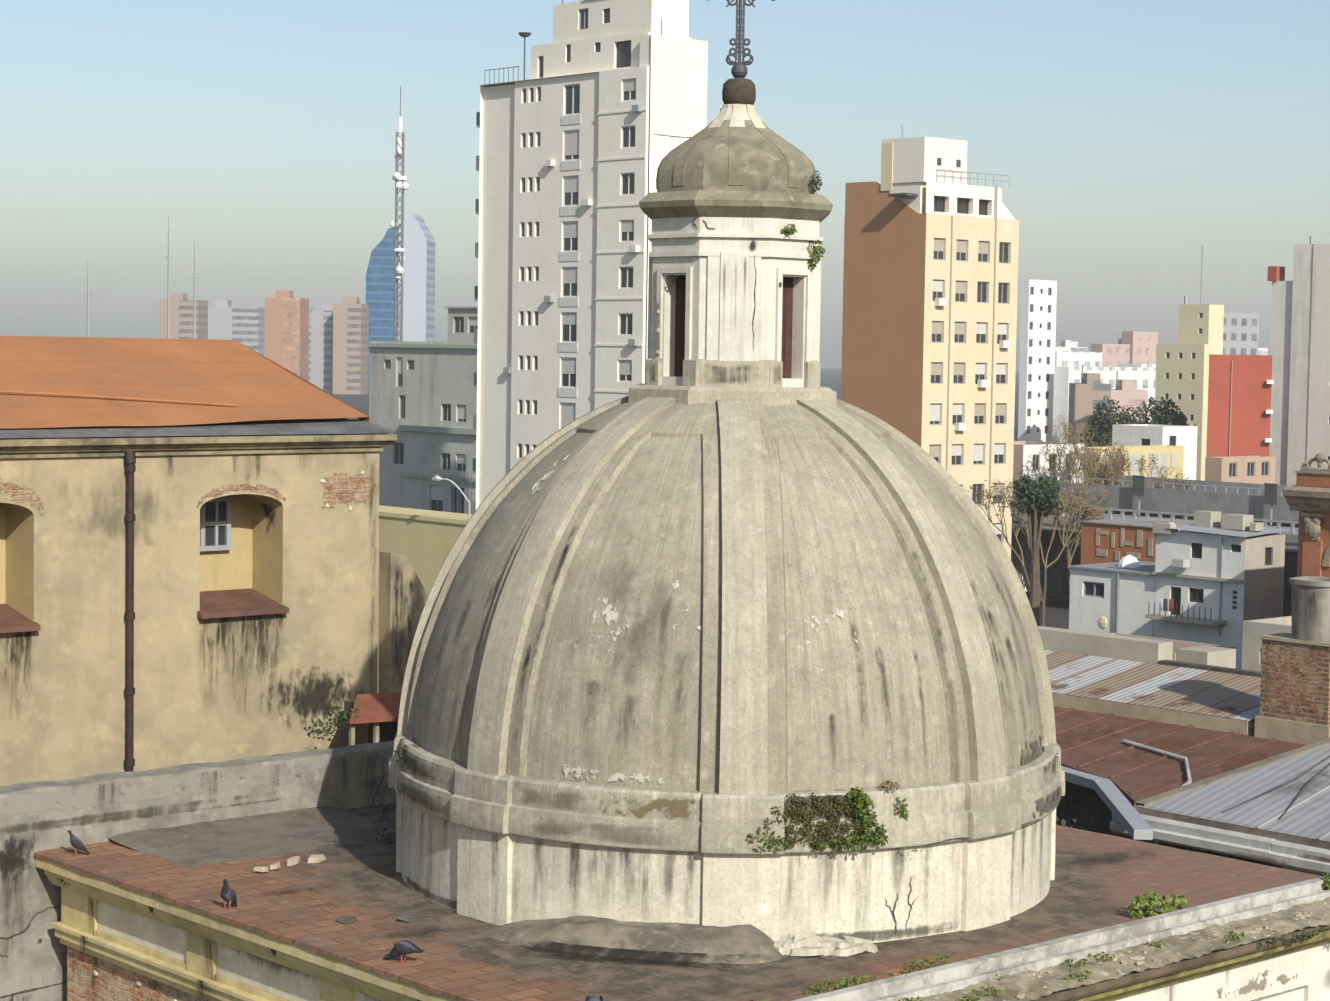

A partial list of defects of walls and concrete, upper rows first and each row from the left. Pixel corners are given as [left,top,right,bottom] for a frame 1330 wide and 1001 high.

spalling [0,479,44,516]
spalling [320,471,379,511]
peeling [531,455,569,497]
leakage [203,615,282,661]
peeling [573,597,642,666]
leakage [982,607,1016,666]
leakage [571,845,579,884]
crack [885,876,919,930]